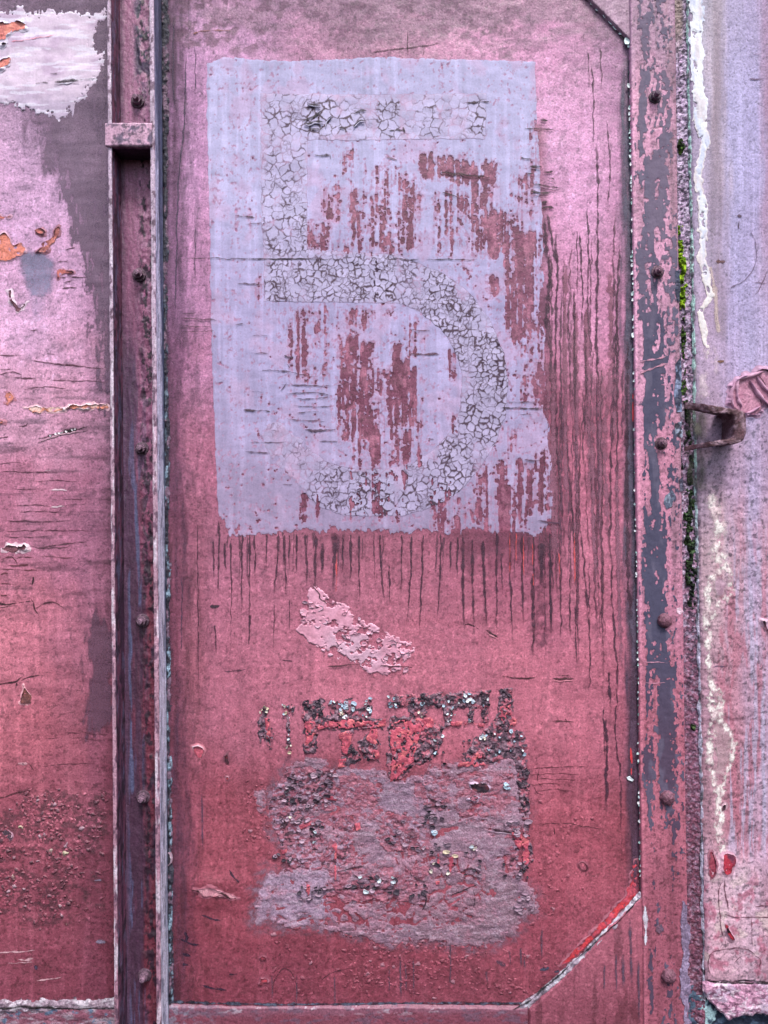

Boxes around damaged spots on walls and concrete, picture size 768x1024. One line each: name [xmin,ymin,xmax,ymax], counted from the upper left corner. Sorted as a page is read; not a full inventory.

peeling [0,18,28,72]
damp [588,49,603,131]
peeling [0,213,62,262]
peeling [56,268,76,281]
crack [183,93,541,517]
damp [212,124,634,807]
peeling [627,0,692,1024]
peeling [296,586,415,675]
peeling [257,687,534,915]